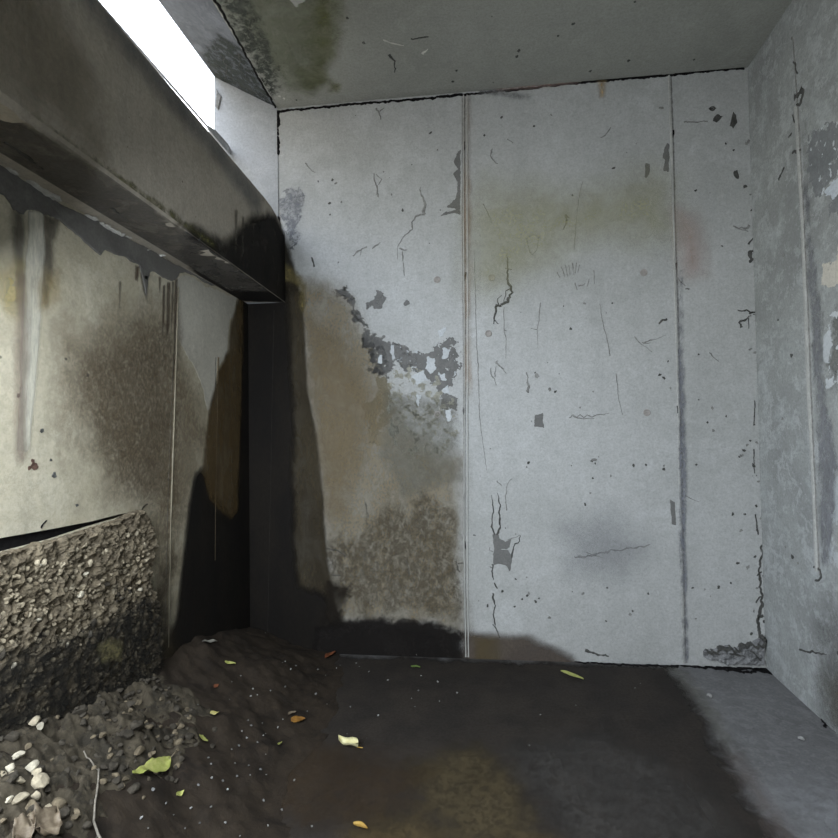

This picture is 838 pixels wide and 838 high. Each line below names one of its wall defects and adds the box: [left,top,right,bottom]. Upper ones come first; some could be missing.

peeling [806,121,838,217]
crack [352,187,427,276]
crack [0,503,148,551]
water stain [0,120,574,740]
peeling [332,285,462,459]
crack [474,252,514,471]
crack [492,593,500,637]
water stain [679,348,687,591]
spalling [703,632,767,666]
crack [755,514,764,638]
peeling [822,311,838,389]
water stain [281,655,787,838]